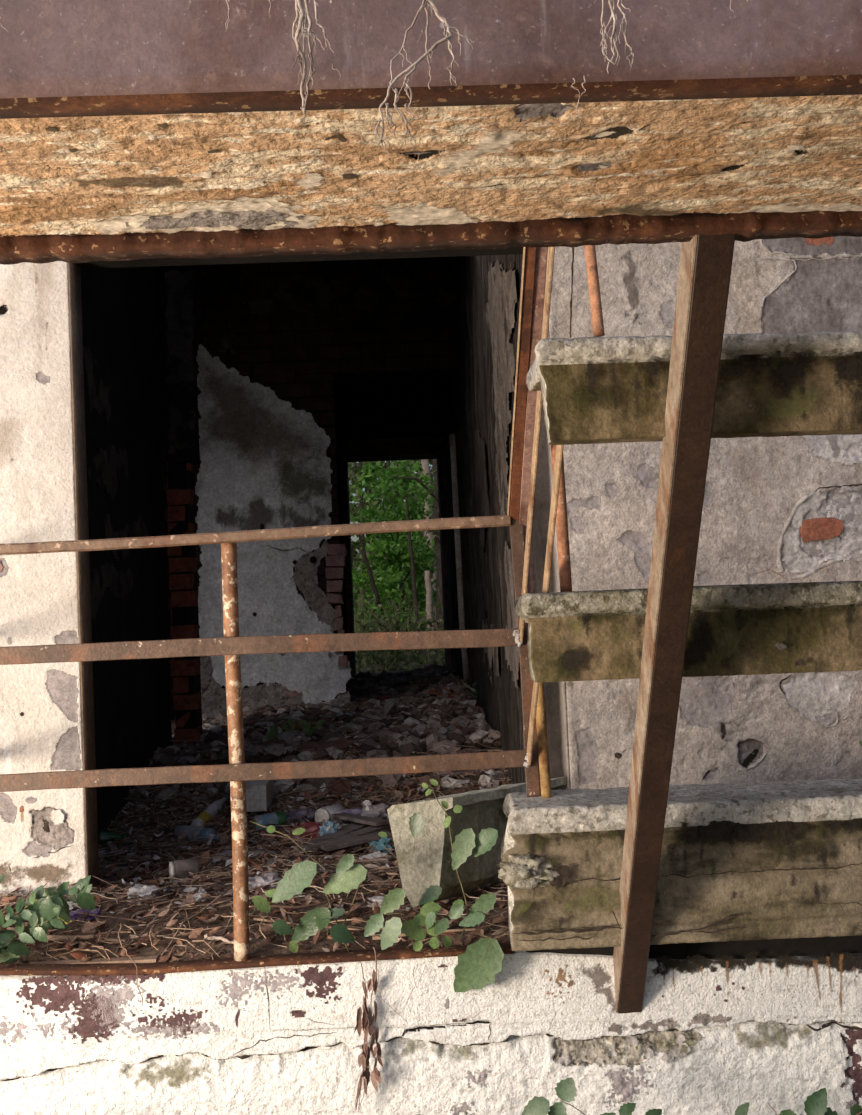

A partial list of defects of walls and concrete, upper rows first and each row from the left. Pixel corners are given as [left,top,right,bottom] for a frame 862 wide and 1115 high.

spalling [757,236,862,336]
spalling [777,484,862,580]
leakage [583,613,593,670]
leakage [684,608,758,669]
spalling [200,656,227,715]
spalling [679,676,766,770]
spalling [0,793,74,857]
peeling [0,966,342,1047]
crack [373,1020,684,1046]
crack [743,1020,862,1031]
corrosion [807,954,856,1006]
spalling [840,1029,862,1109]